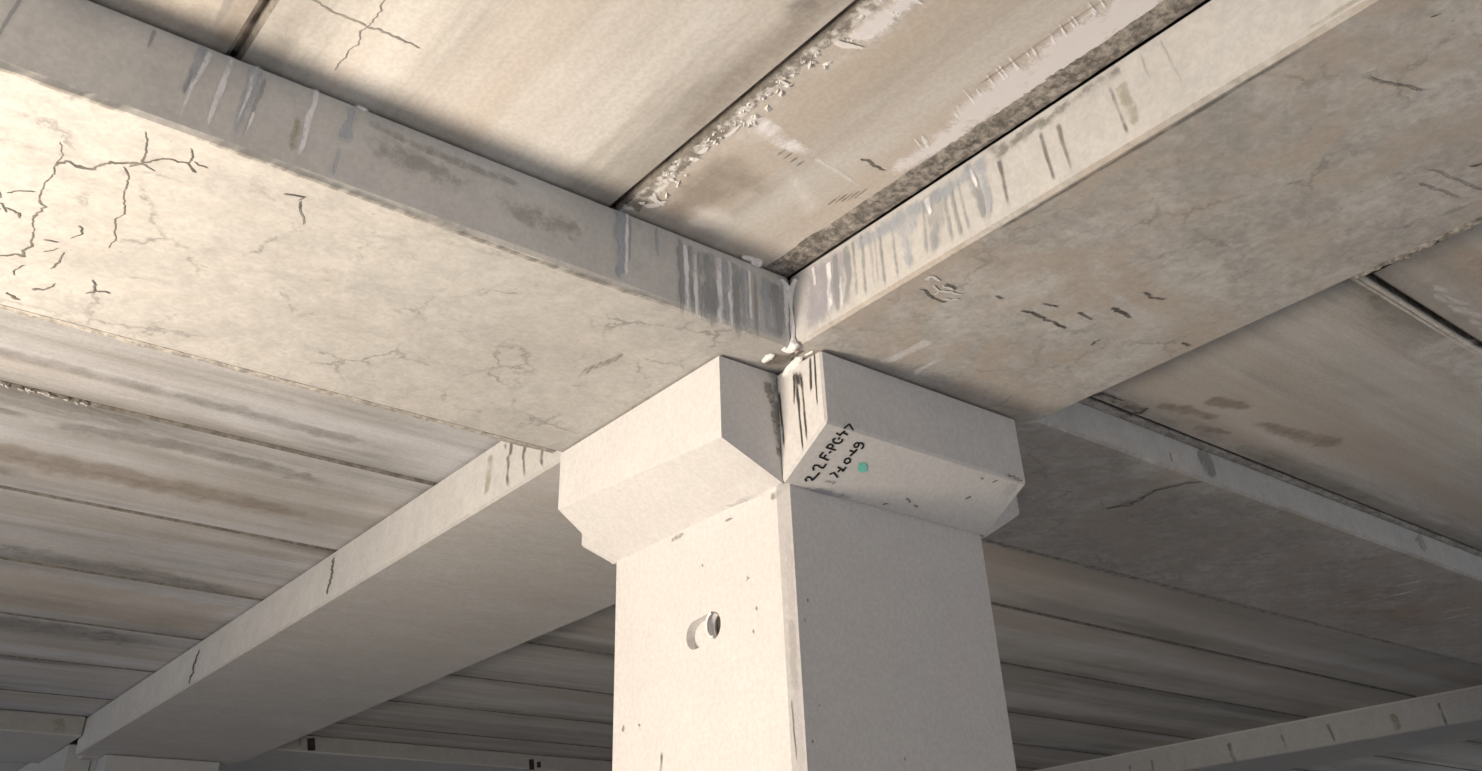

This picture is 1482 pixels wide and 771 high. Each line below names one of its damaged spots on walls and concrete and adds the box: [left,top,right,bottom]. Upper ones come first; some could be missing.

crack [312,0,419,70]
leakage [184,48,212,104]
leakage [207,60,232,123]
leakage [298,90,319,152]
leakage [616,0,922,276]
crack [0,132,207,300]
leakage [678,161,991,448]